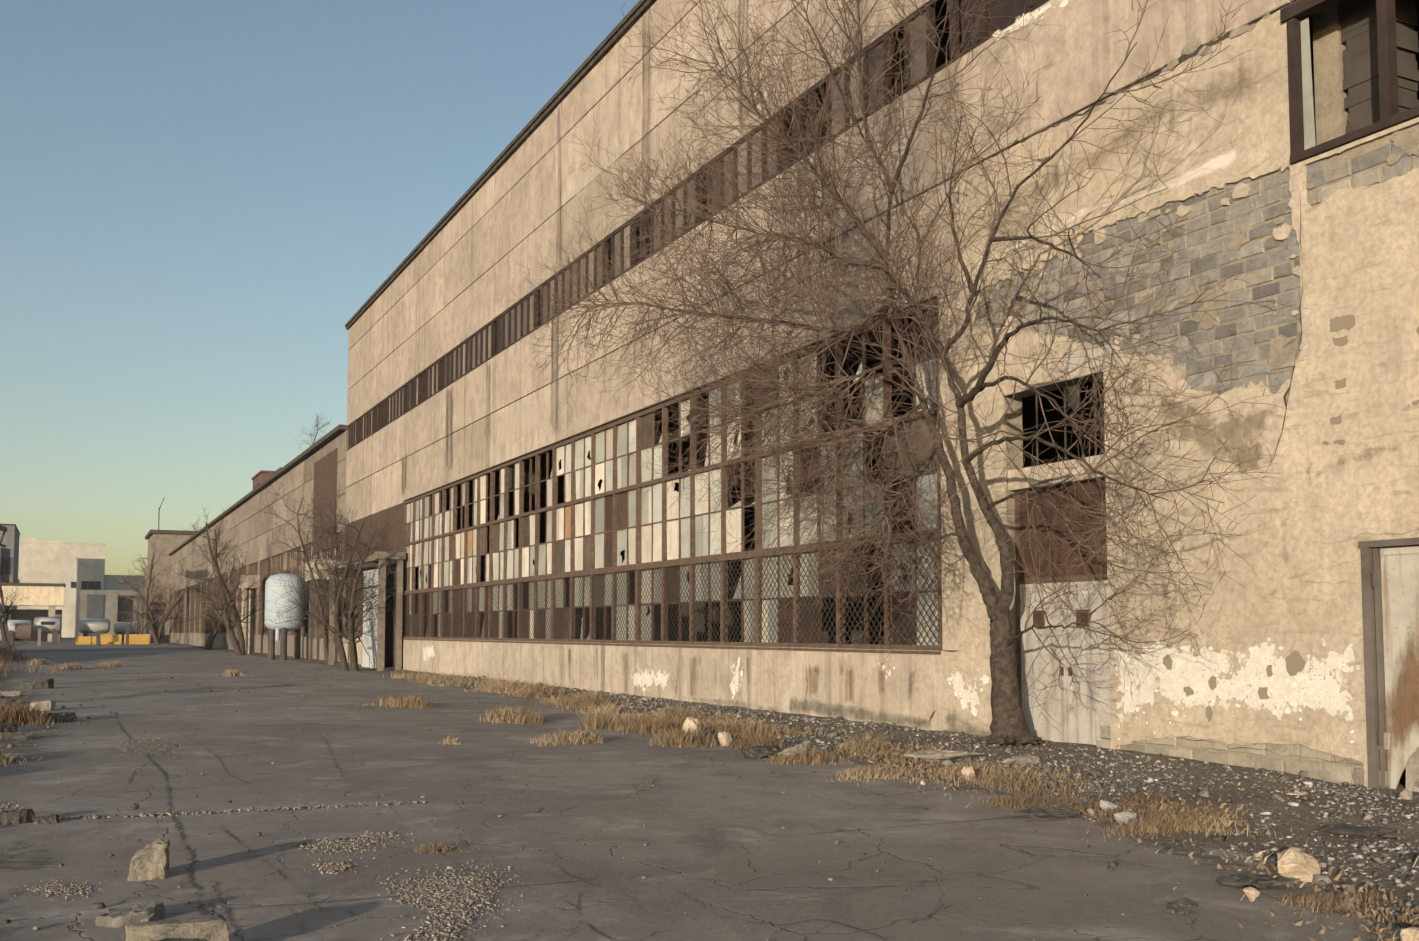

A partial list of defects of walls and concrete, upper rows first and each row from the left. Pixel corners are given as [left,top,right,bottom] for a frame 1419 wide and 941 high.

spalling [992,0,1068,41]
flaking render [968,128,1419,395]
crack [1264,192,1303,476]
flaking render [1161,398,1272,470]
flaking render [1322,415,1345,445]
peeling [947,664,990,717]
peeling [1096,634,1391,788]
rust [1385,643,1419,758]